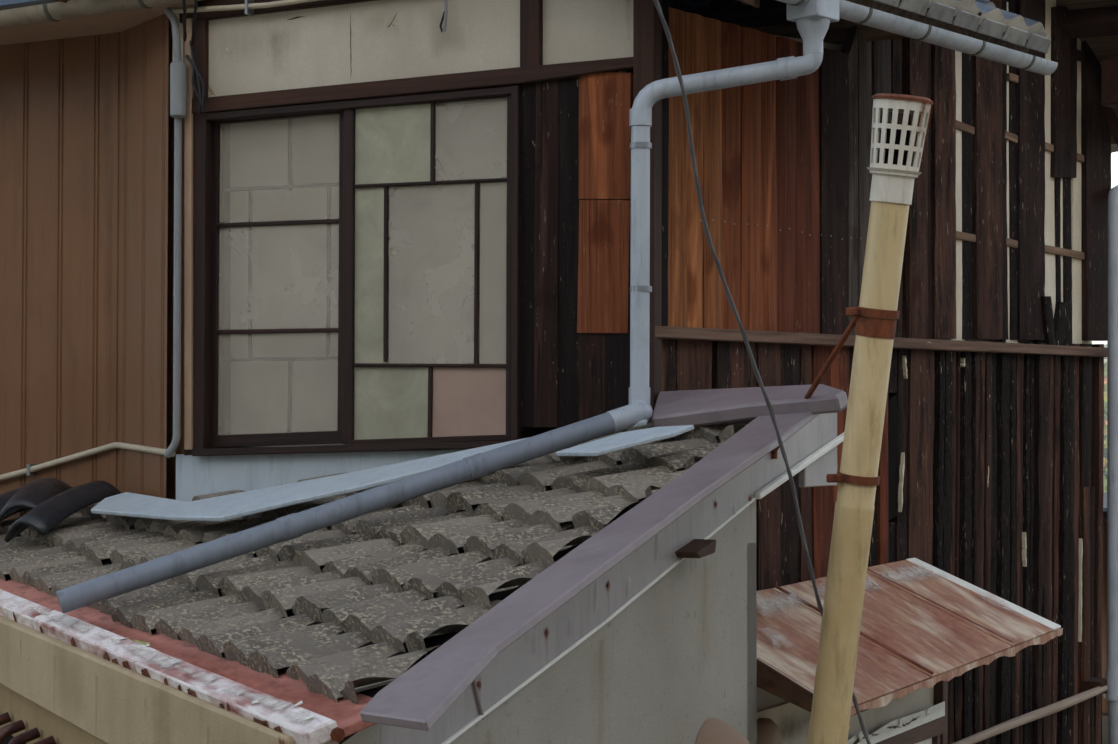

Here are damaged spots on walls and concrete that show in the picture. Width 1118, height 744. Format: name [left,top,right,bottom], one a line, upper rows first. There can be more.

rust [103,651,150,678]
rust [253,717,284,744]
rust [330,727,346,742]